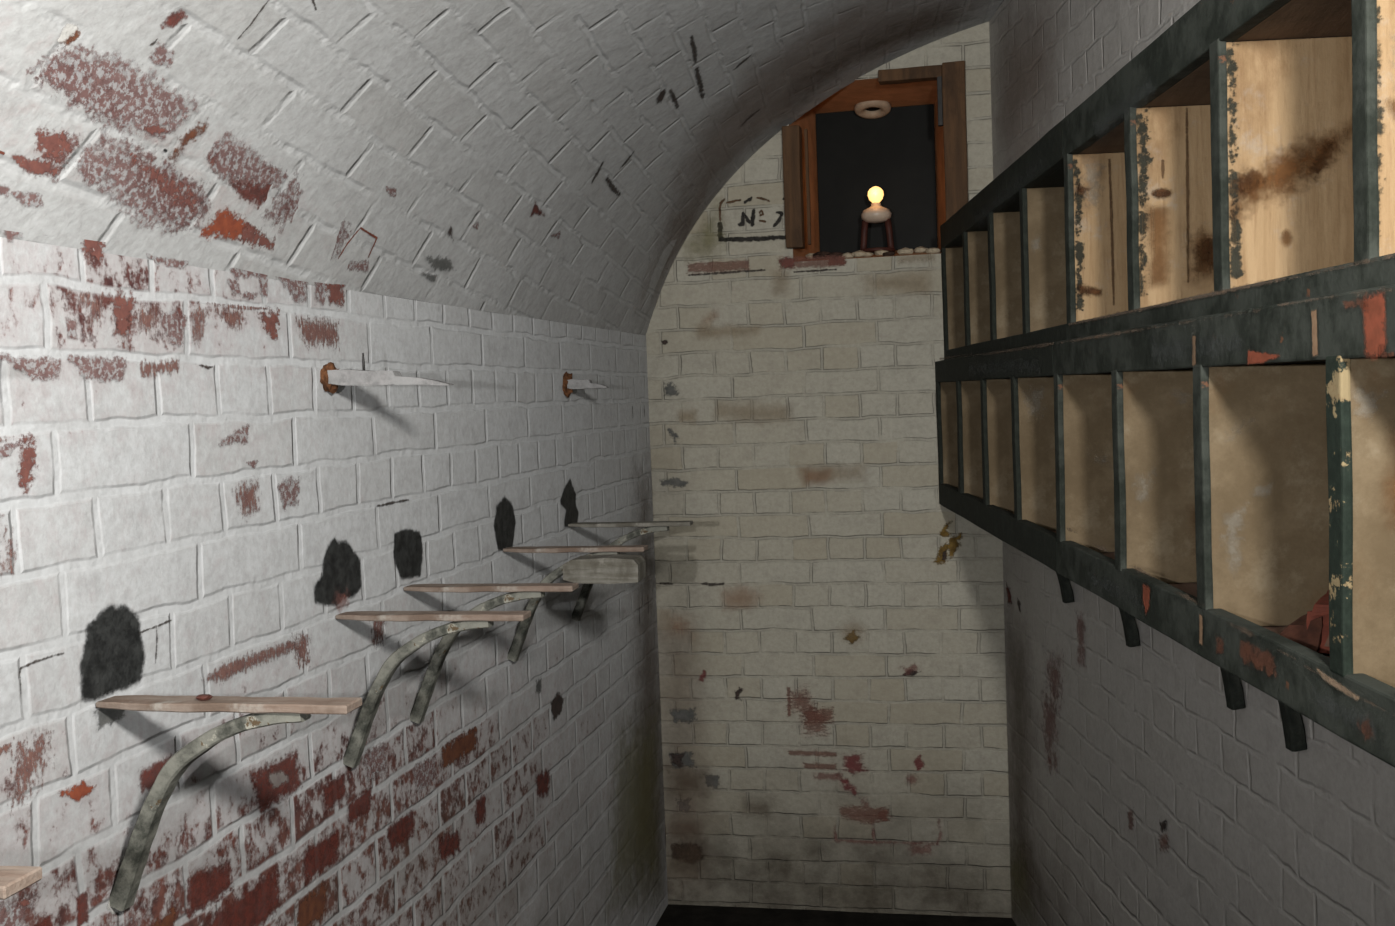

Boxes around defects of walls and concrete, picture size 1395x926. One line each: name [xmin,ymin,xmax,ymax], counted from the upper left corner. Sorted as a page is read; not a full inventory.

peeling [12,10,301,250]
peeling [0,186,43,207]
peeling [0,221,378,383]
peeling [0,434,37,494]
peeling [0,731,55,807]
peeling [60,781,93,801]
peeling [413,726,477,791]
peeling [787,688,841,779]
peeling [115,744,386,926]
peeling [387,810,414,852]
peeling [438,829,461,861]
peeling [77,891,89,926]